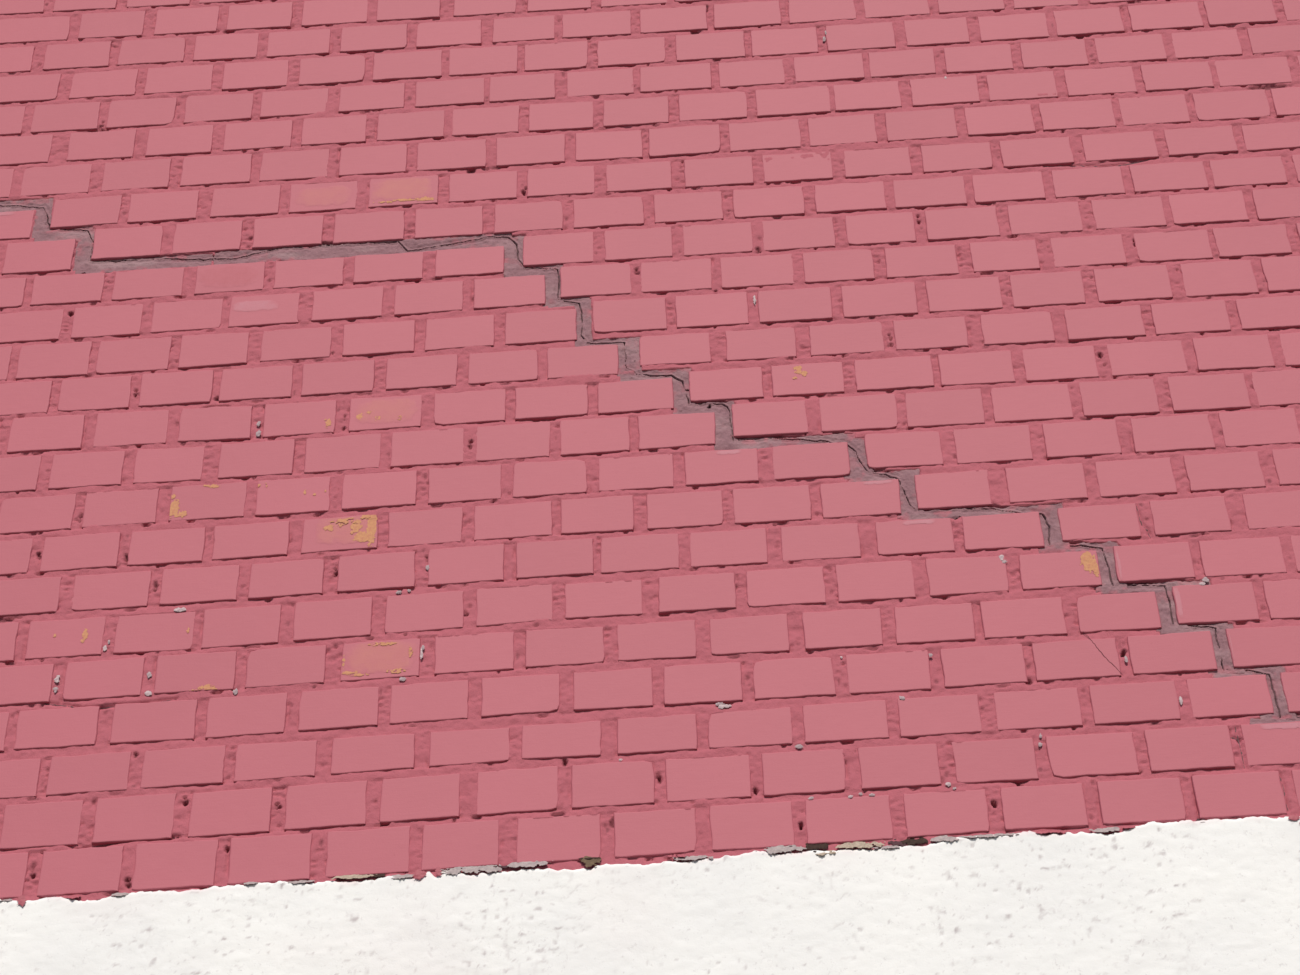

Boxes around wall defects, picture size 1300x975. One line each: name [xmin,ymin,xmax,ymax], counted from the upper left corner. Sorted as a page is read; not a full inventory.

crack [1044,159,1151,167]
crack [0,198,1300,768]
peeling [323,515,377,547]
peeling [1080,551,1099,577]